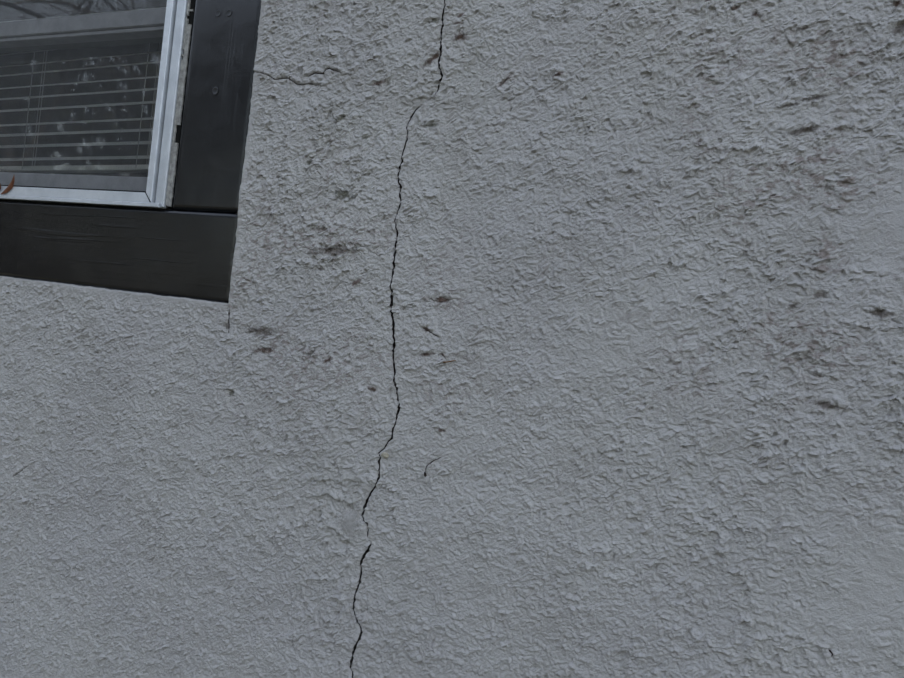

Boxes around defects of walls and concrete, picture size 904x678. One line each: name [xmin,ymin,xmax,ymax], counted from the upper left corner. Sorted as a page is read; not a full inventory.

crack [350,0,446,678]